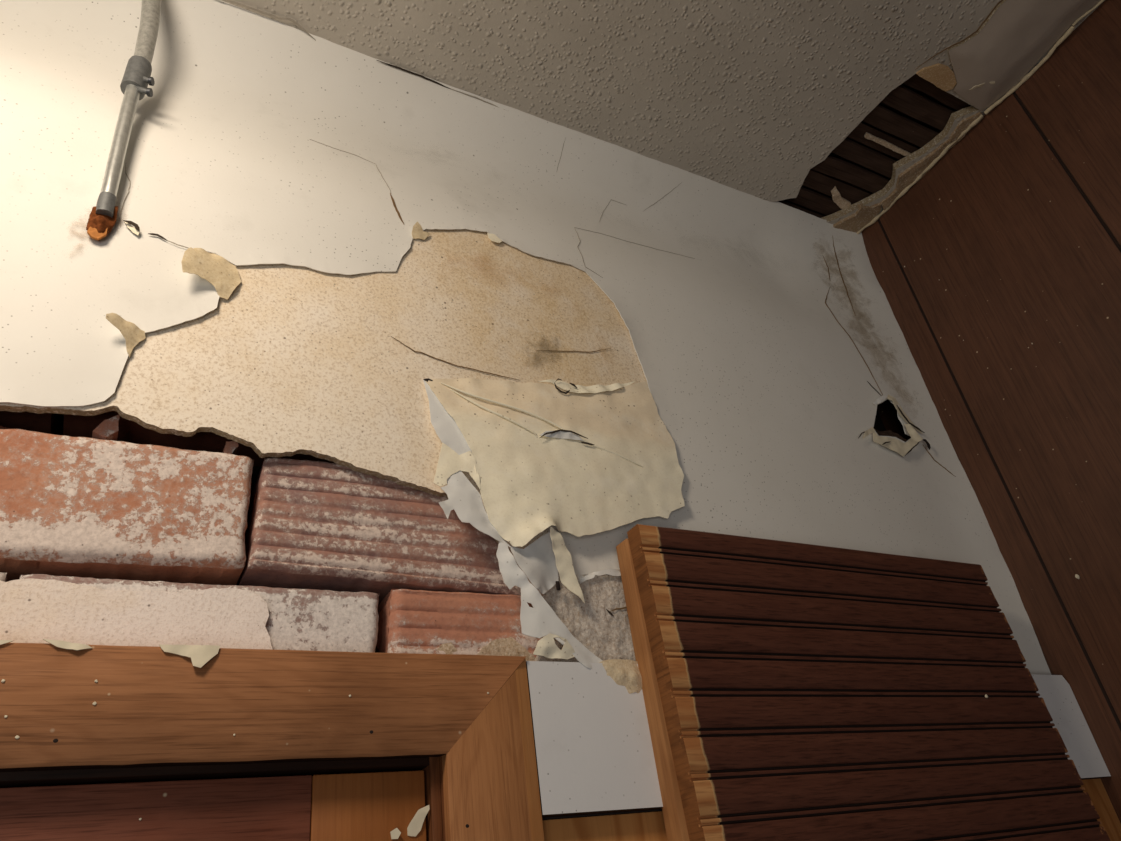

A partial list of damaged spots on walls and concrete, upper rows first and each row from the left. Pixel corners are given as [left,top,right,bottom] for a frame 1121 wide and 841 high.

crack [222,0,316,41]
crack [377,60,499,108]
flaking render [916,63,957,92]
crack [310,139,404,224]
corrosion [86,206,118,241]
crack [574,183,695,278]
spalling [859,394,931,457]
peeling [0,221,685,694]